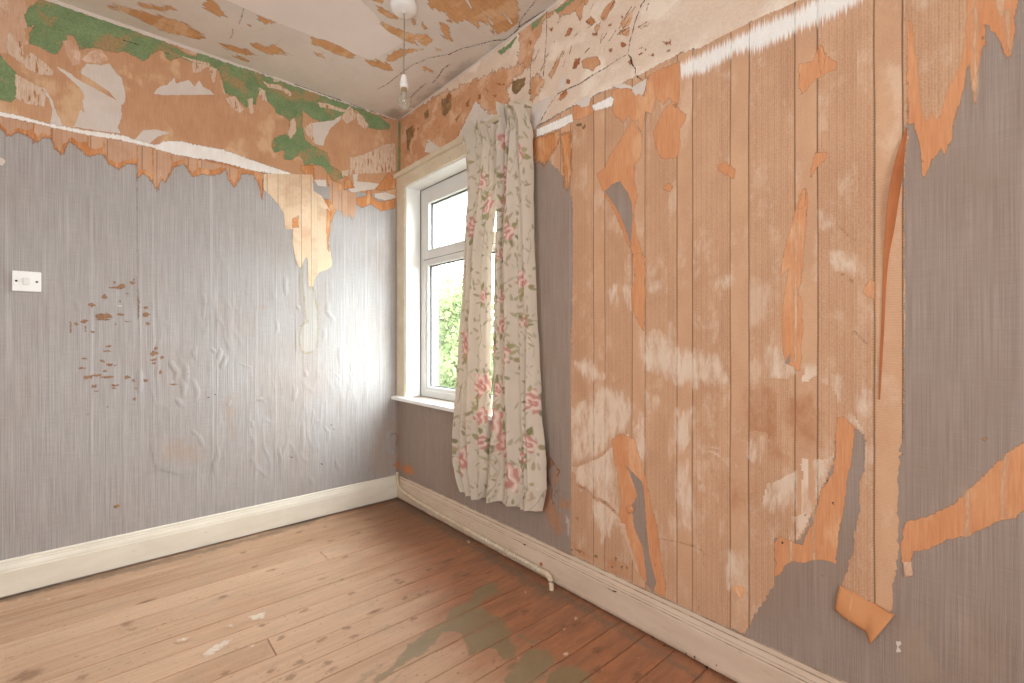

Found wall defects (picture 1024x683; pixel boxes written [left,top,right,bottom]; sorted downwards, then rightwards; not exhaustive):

crack [295,0,645,122]
flaking render [40,63,126,133]
flaking render [154,78,214,95]
flaking render [611,79,647,96]
flaking render [135,129,169,143]
flaking render [312,116,341,146]
flaking render [349,174,395,200]
peeling [70,279,151,333]
peeling [79,345,116,392]
peeling [112,347,164,401]